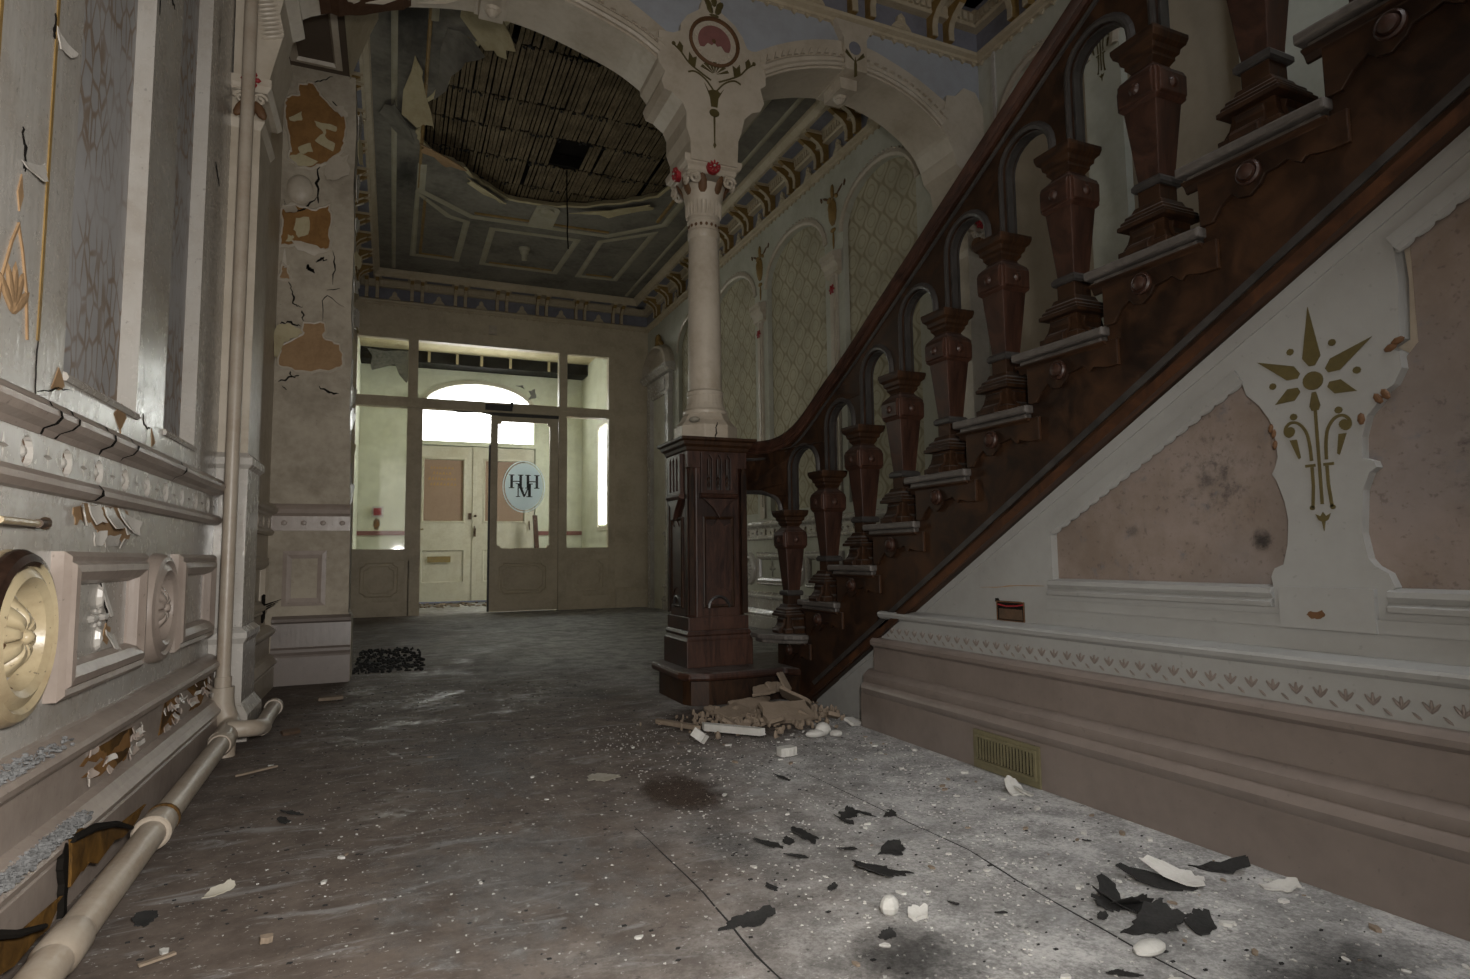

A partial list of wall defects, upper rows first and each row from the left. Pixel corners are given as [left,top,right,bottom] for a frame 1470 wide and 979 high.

flaking render [319,0,515,59]
peeling [402,55,671,218]
flaking render [274,76,588,463]
peeling [79,676,214,787]